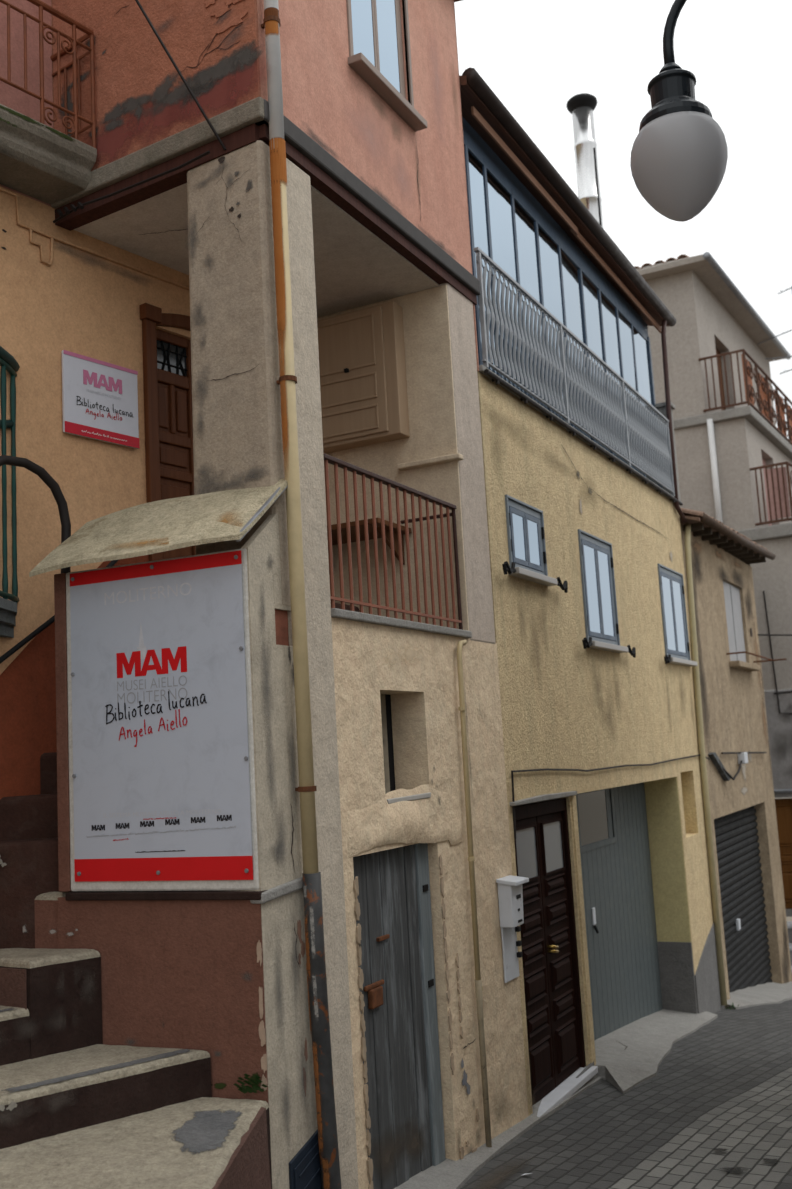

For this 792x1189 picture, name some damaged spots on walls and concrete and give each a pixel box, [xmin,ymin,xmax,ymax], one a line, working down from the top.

crack [176,4,248,76]
rust [304,917,330,1189]